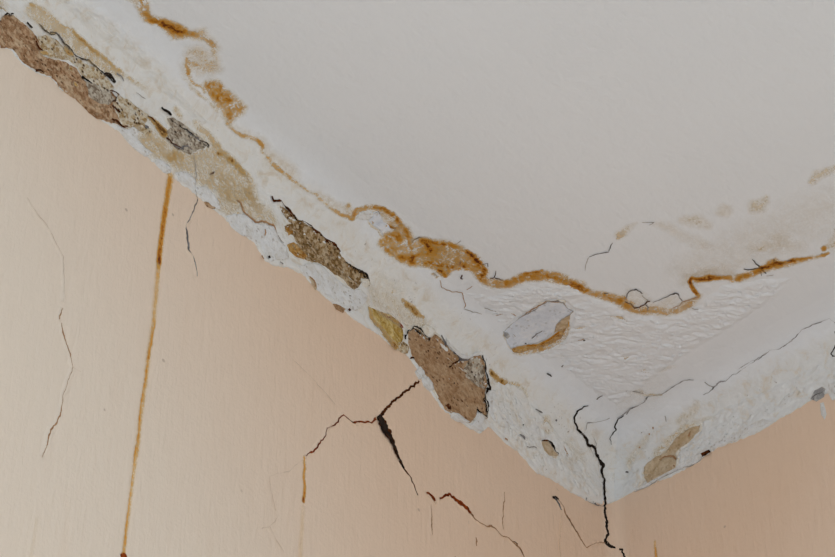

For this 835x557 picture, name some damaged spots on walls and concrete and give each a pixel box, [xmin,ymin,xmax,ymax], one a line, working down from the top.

damp [27,3,132,80]
damp [132,0,830,319]
rust [120,173,173,557]
spalling [0,6,601,500]
crack [262,362,525,557]
damp [401,298,425,325]
crack [434,273,559,317]
peeling [466,277,792,404]
crack [604,289,699,310]
spalling [642,424,702,483]
crack [551,318,835,557]
spalling [811,387,826,420]